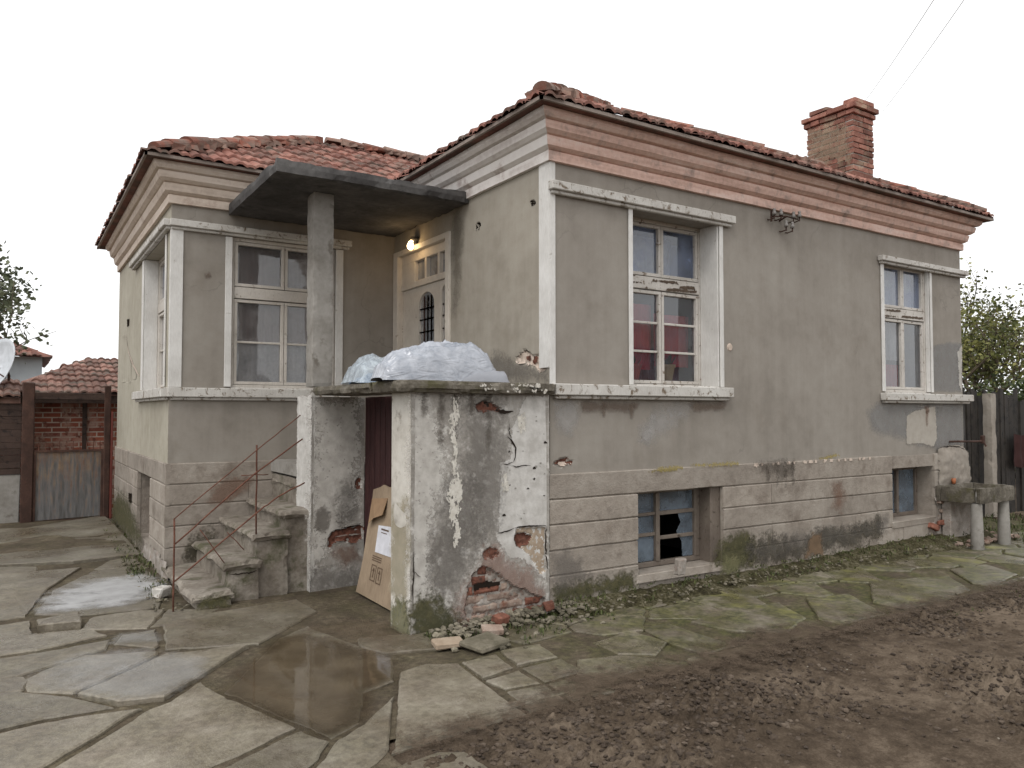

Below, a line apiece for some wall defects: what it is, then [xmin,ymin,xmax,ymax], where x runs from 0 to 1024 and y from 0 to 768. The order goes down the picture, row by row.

peeling [633,274,697,293]
flaking render [516,350,546,372]
crack [505,424,531,467]
peeling [305,396,365,568]
peeling [405,392,463,617]
peeling [464,395,572,635]
damp [748,515,883,567]